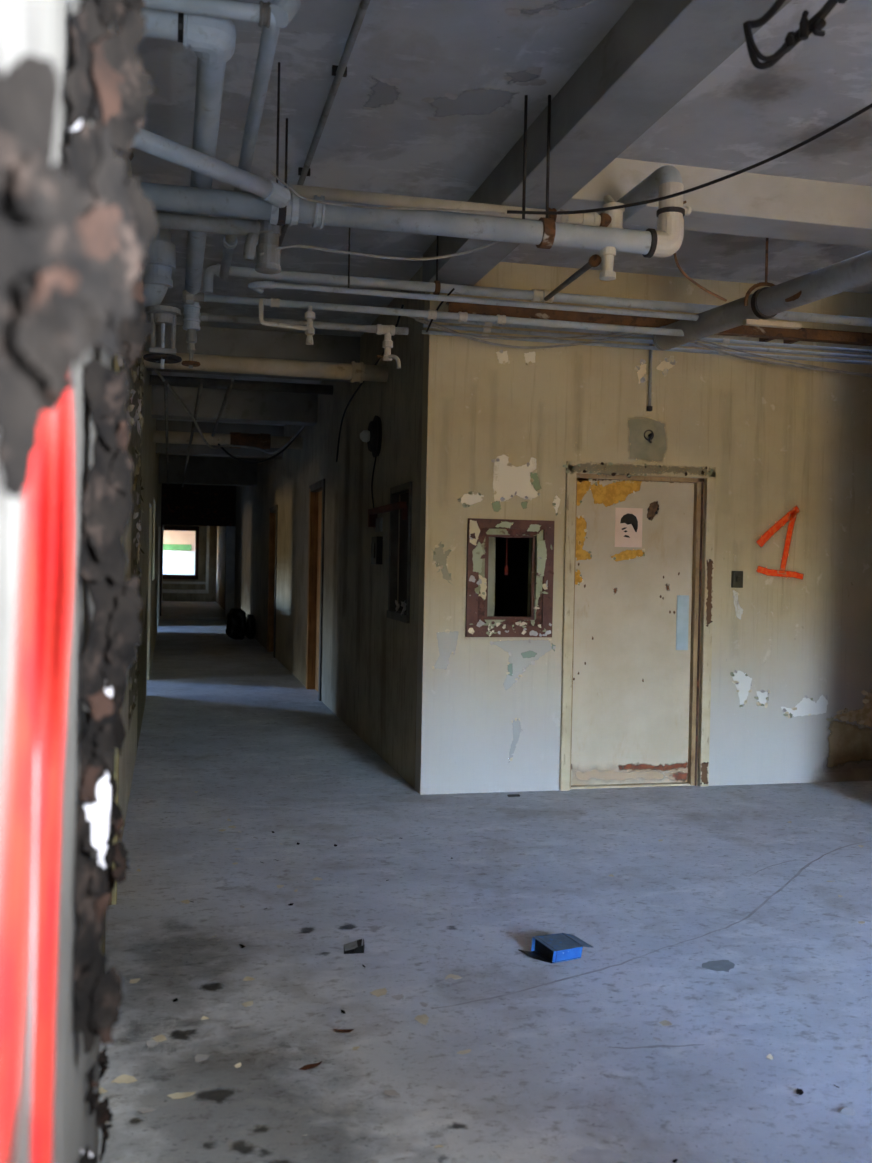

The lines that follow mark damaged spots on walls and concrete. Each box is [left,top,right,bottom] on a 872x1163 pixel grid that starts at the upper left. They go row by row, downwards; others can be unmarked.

peeling [457,454,561,516]
peeling [563,462,687,586]
peeling [0,0,158,1163]
peeling [468,620,556,690]
peeling [730,670,872,767]